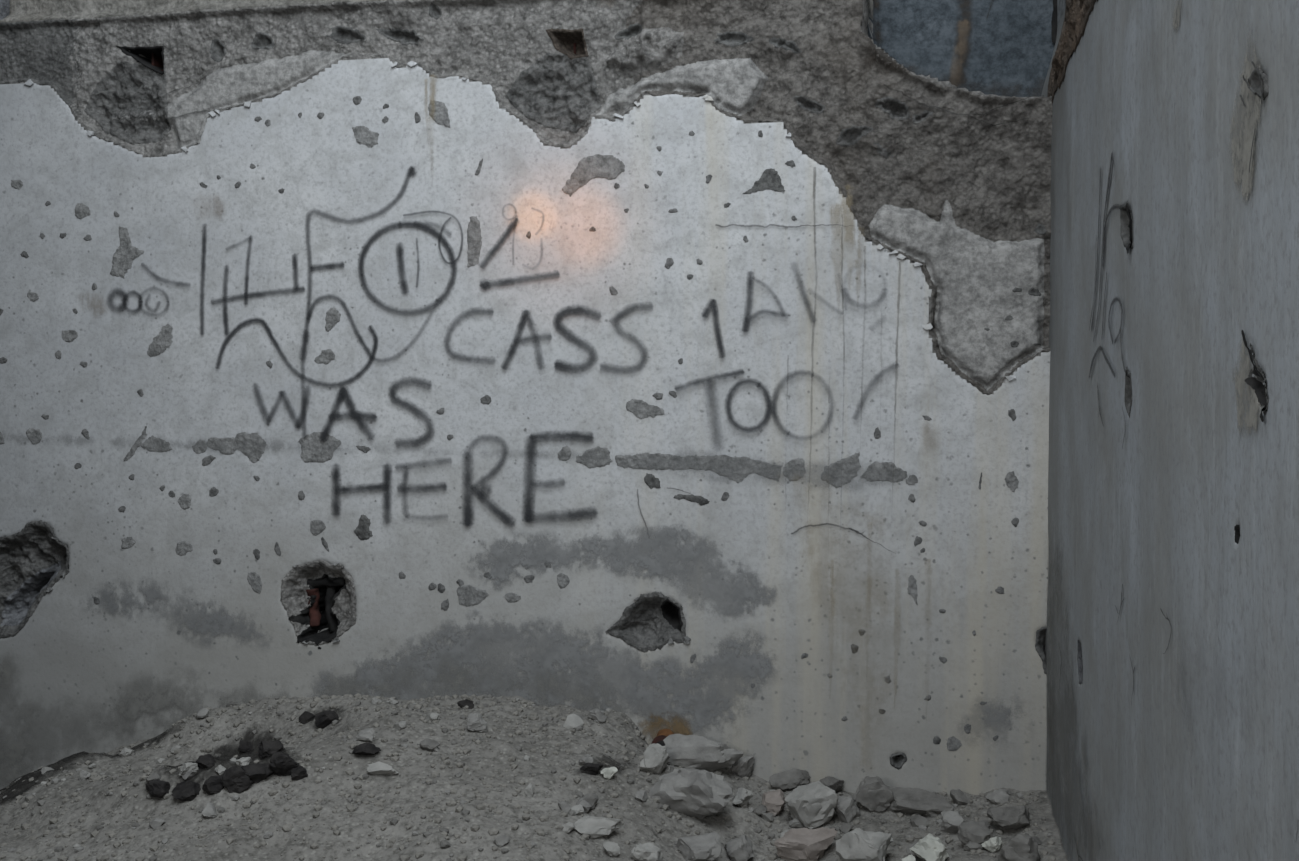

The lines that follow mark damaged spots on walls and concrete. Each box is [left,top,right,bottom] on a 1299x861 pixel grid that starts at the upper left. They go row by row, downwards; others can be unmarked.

spalling [1230,49,1269,200]
spalling [0,0,1098,395]
spalling [1120,202,1134,254]
spalling [1235,330,1269,433]
spalling [0,520,70,639]
spalling [247,520,357,649]
leakage [314,620,772,732]
leakage [474,527,776,615]
spalling [605,591,696,663]